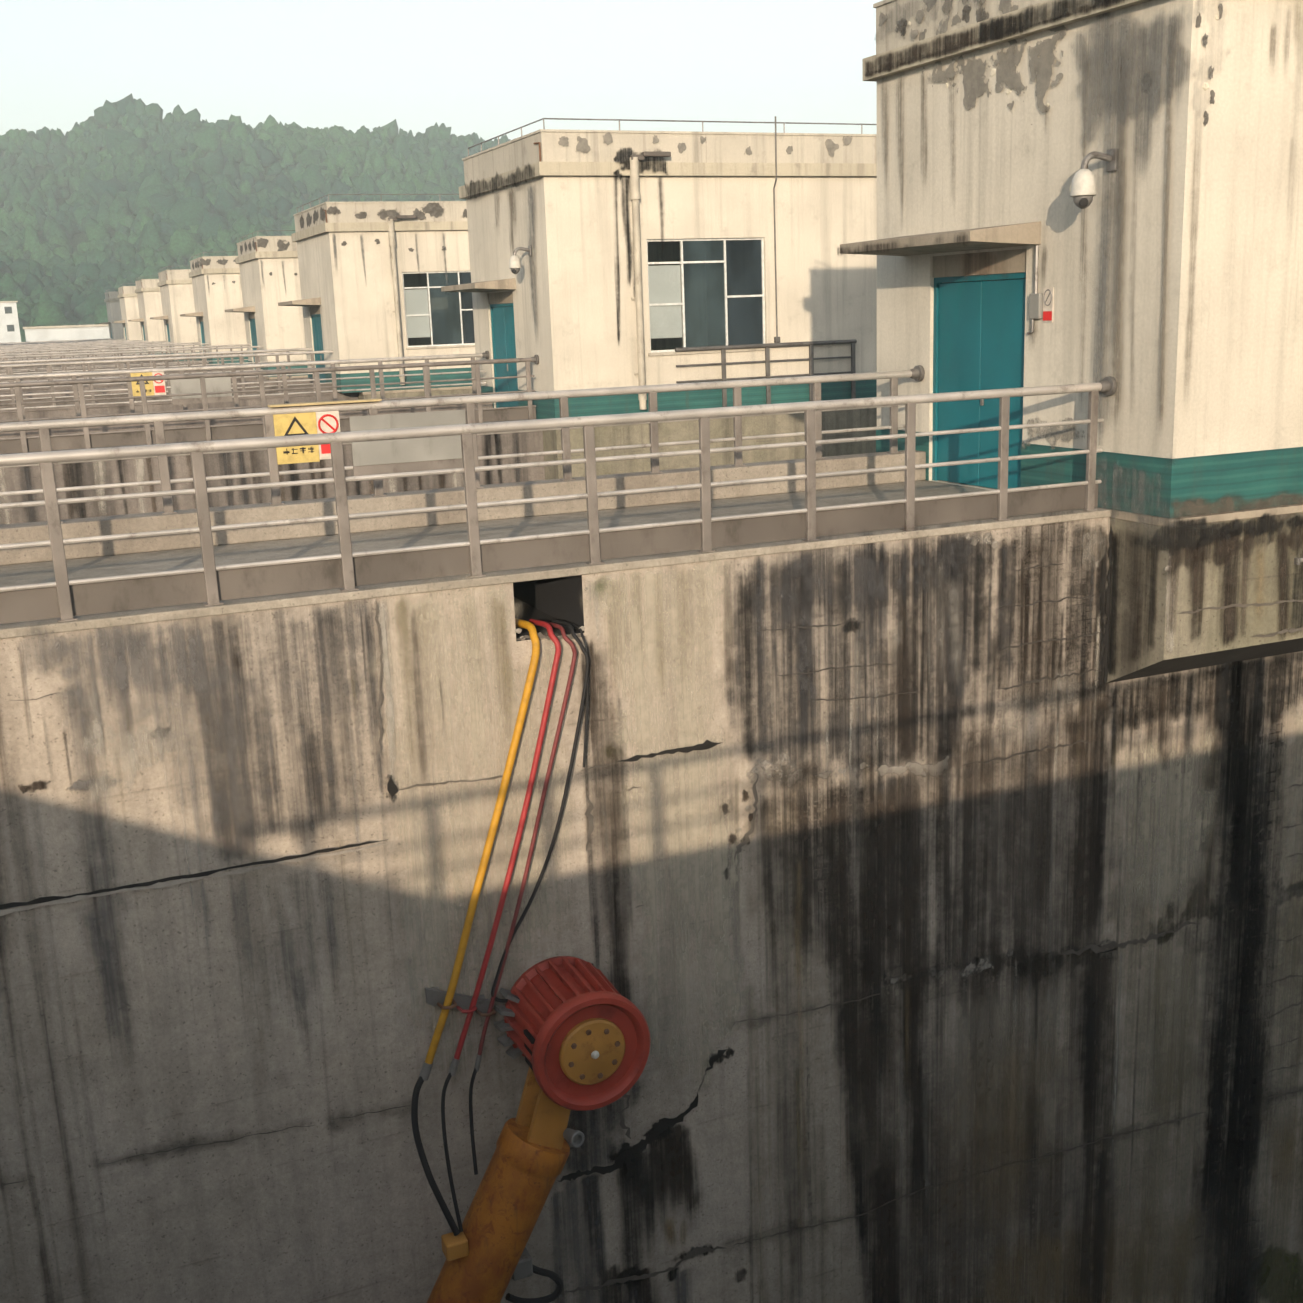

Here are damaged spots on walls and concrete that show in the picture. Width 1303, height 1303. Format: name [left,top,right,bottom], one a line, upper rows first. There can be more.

peeling [879,0,1018,40]
peeling [558,132,612,153]
leakage [615,176,635,342]
peeling [825,136,852,157]
leakage [1080,12,1181,431]
leakage [1098,464,1303,636]
crack [0,839,389,916]
leakage [406,626,548,1003]
crack [585,740,723,854]
leakage [582,572,740,1082]
leakage [709,534,1303,1303]
crack [559,991,894,1183]